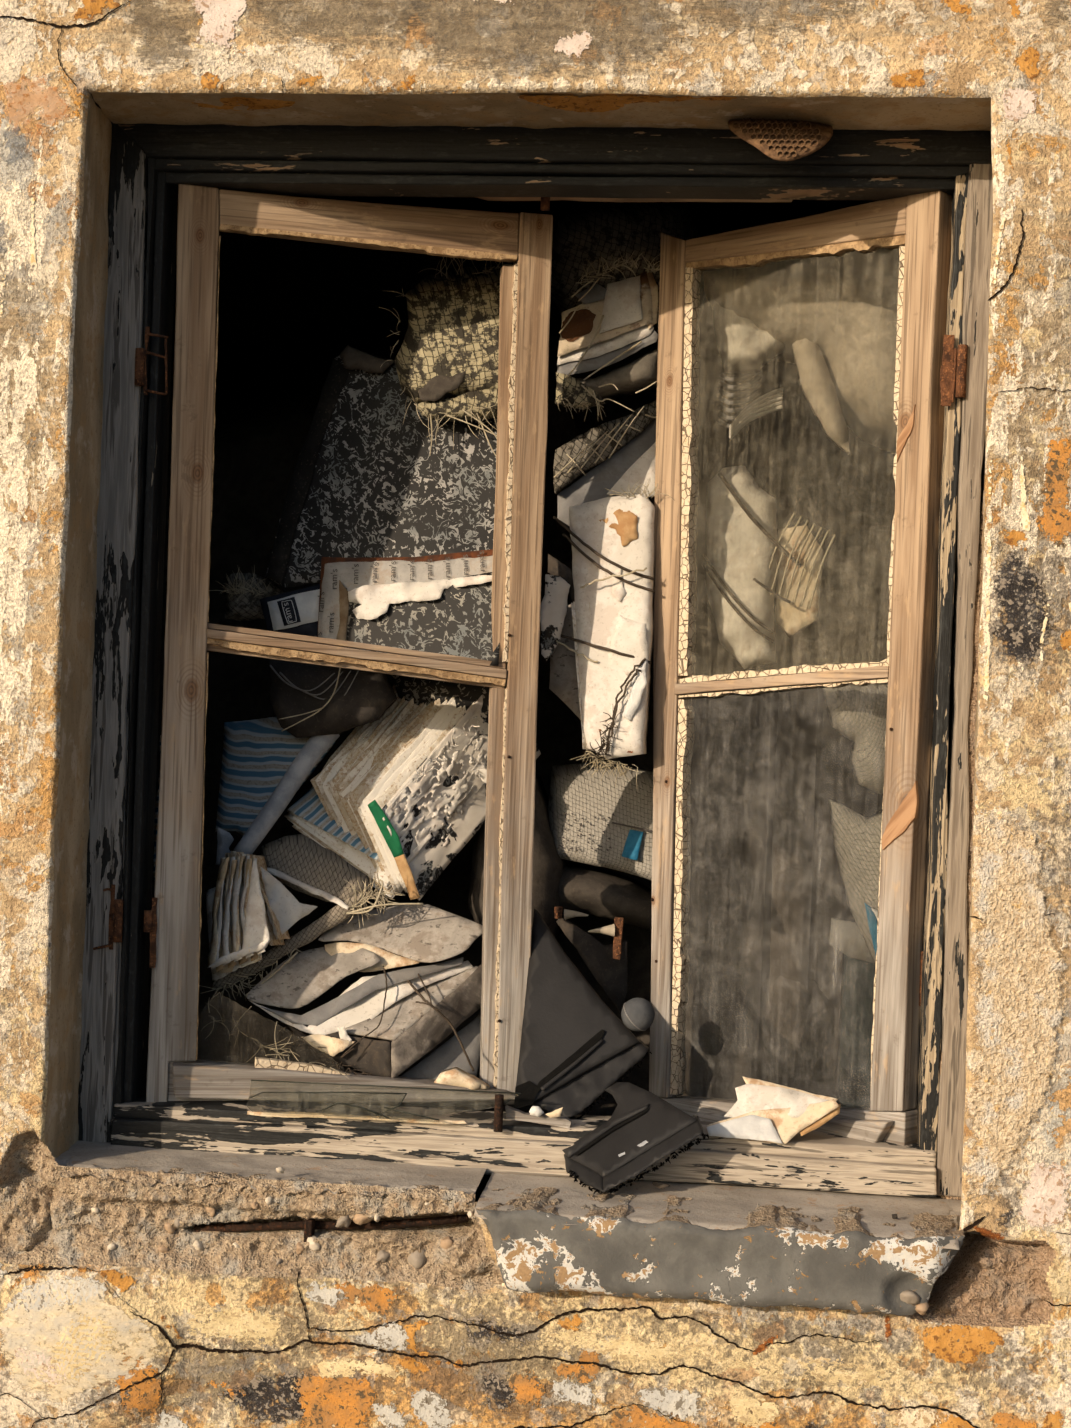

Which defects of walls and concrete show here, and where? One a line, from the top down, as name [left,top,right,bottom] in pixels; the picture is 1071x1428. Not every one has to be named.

crack [0,1,131,85]
crack [988,210,1025,301]
spalling [0,1130,504,1428]
crack [0,1265,980,1428]
spalling [903,1162,1071,1366]